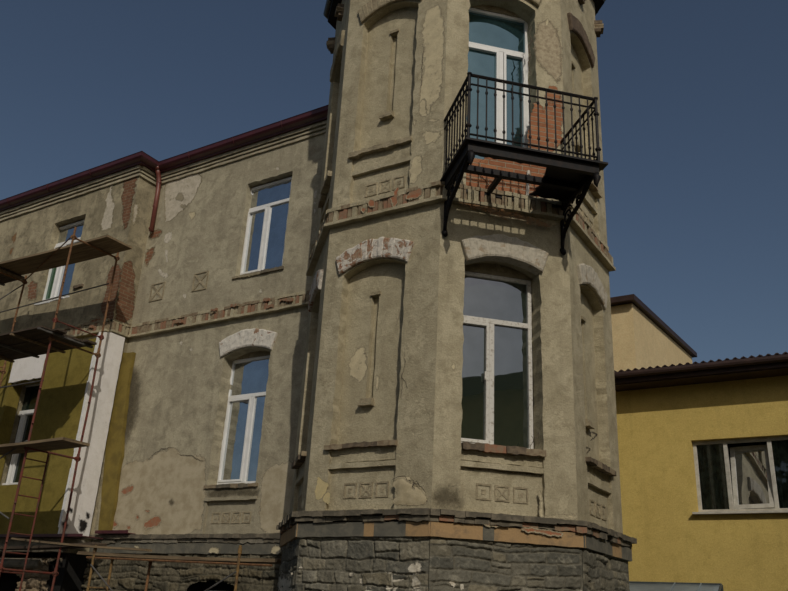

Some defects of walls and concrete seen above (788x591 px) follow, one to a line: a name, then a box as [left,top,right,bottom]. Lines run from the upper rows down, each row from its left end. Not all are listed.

peeling [413,5,445,144]
peeling [100,182,115,231]
peeling [158,173,202,278]
peeling [390,155,424,207]
peeling [349,346,368,382]